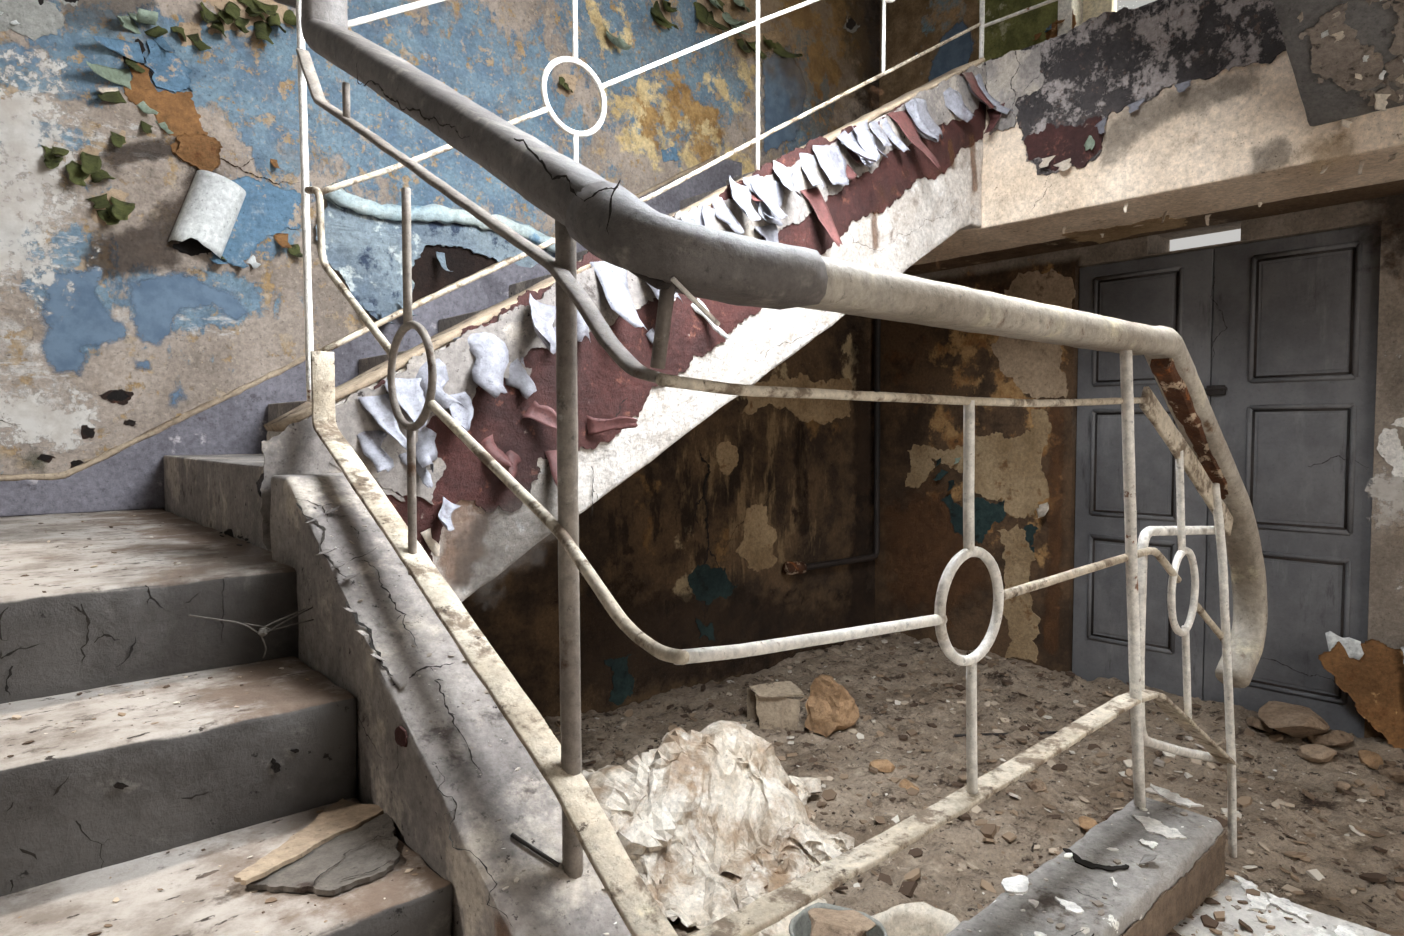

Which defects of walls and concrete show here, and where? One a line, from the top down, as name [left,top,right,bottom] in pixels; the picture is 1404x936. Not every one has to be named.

peeling [41,0,303,269]
peeling [651,0,1404,255]
peeling [335,282,557,564]
peeling [577,251,762,451]
damp [580,330,875,702]
peeling [742,372,852,425]
peeling [905,336,1068,663]
peeling [1004,268,1076,309]
corrosion [1150,358,1229,500]
crack [0,608,38,694]
crack [294,497,512,926]
peeling [1001,784,1211,936]